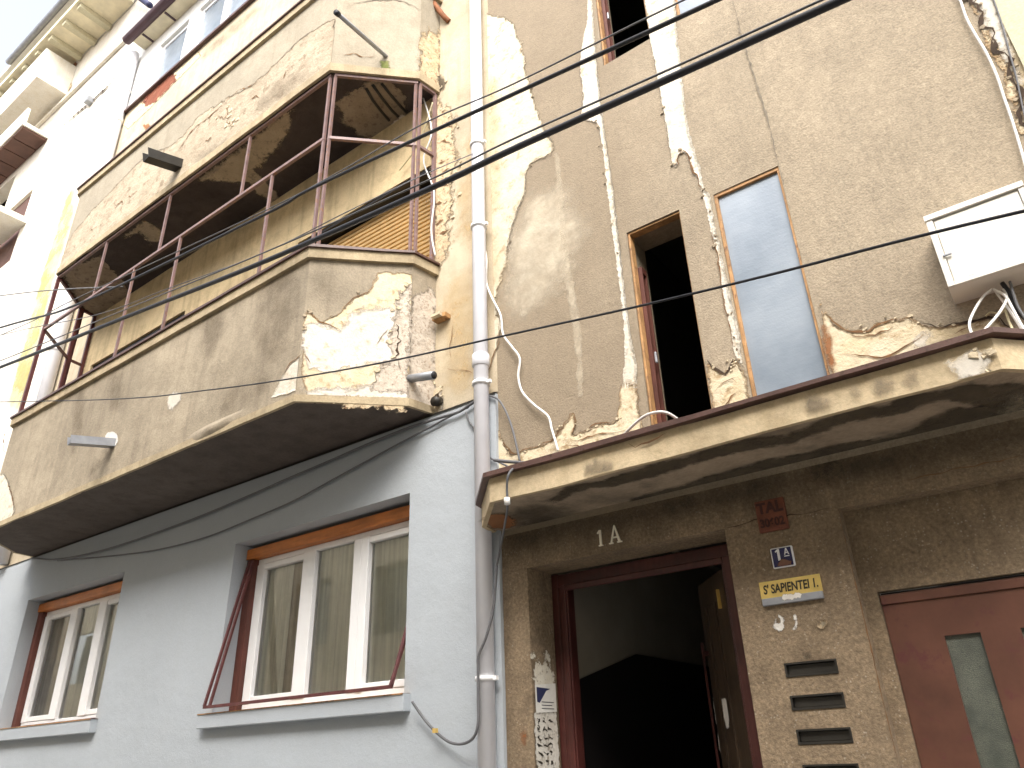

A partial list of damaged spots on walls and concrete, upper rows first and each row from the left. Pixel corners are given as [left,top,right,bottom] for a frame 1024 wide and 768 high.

flaking render [417,0,462,271]
flaking render [487,13,554,370]
flaking render [498,0,643,468]
flaking render [645,0,750,408]
flaking render [966,0,1024,134]
flaking render [271,271,444,413]
flaking render [819,303,1010,378]
leakage [516,380,1024,546]
peeling [530,650,555,685]